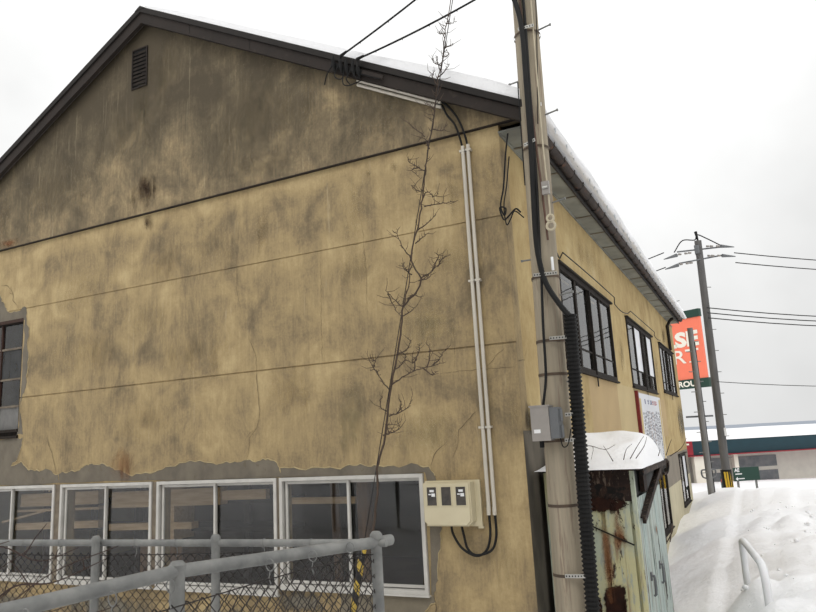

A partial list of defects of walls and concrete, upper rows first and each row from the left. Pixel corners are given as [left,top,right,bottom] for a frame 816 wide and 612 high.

flaking render [0,294,436,486]
flaking render [384,526,442,612]